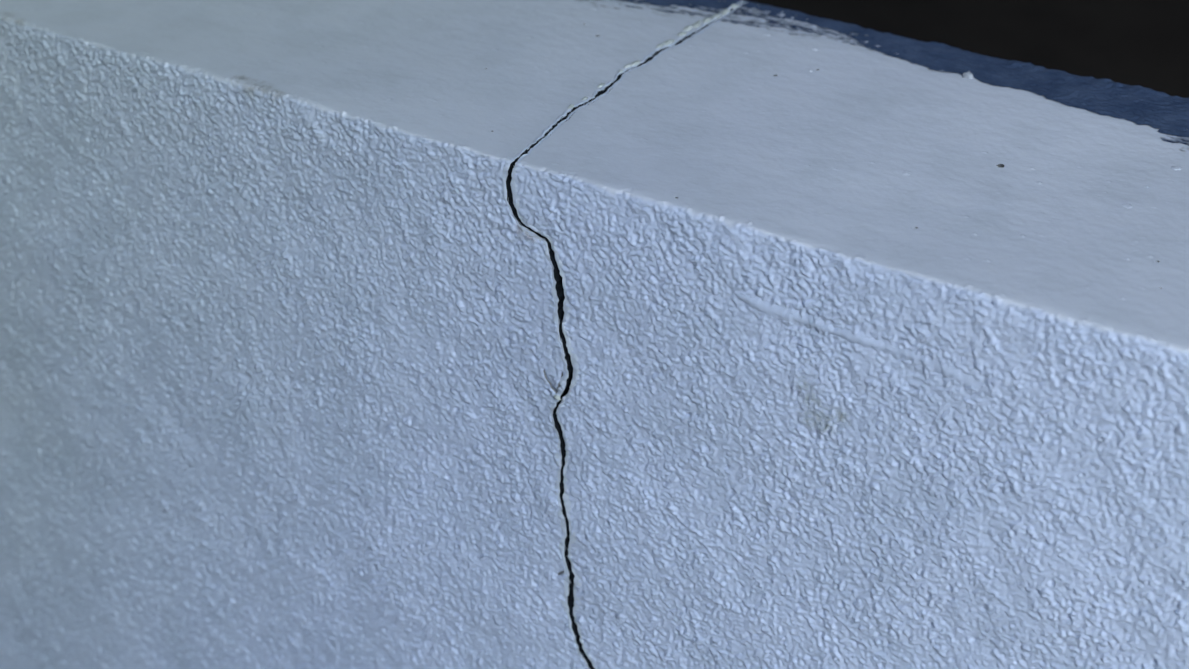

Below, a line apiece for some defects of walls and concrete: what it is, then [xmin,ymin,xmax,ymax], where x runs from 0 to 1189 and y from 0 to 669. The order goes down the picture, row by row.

crack [501,1,747,669]